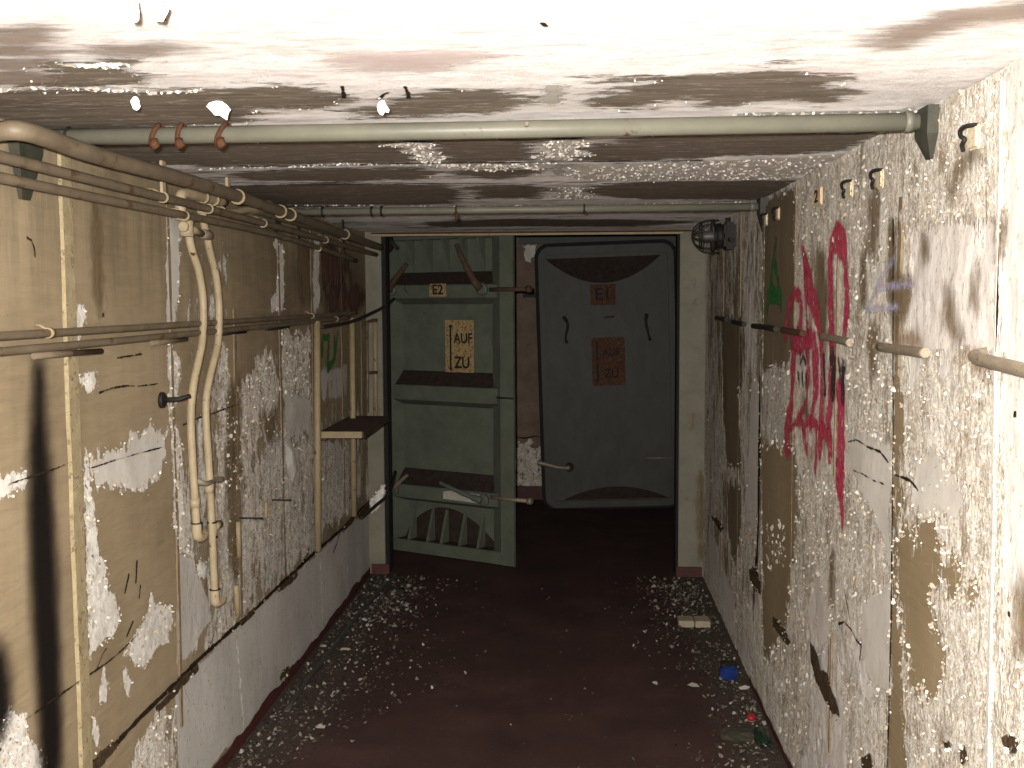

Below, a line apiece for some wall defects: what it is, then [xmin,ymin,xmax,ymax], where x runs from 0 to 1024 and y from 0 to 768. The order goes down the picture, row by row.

peeling [895,65,1011,249]
peeling [82,133,1024,768]
crack [848,218,918,768]
crack [828,590,862,668]
peeling [0,705,42,768]